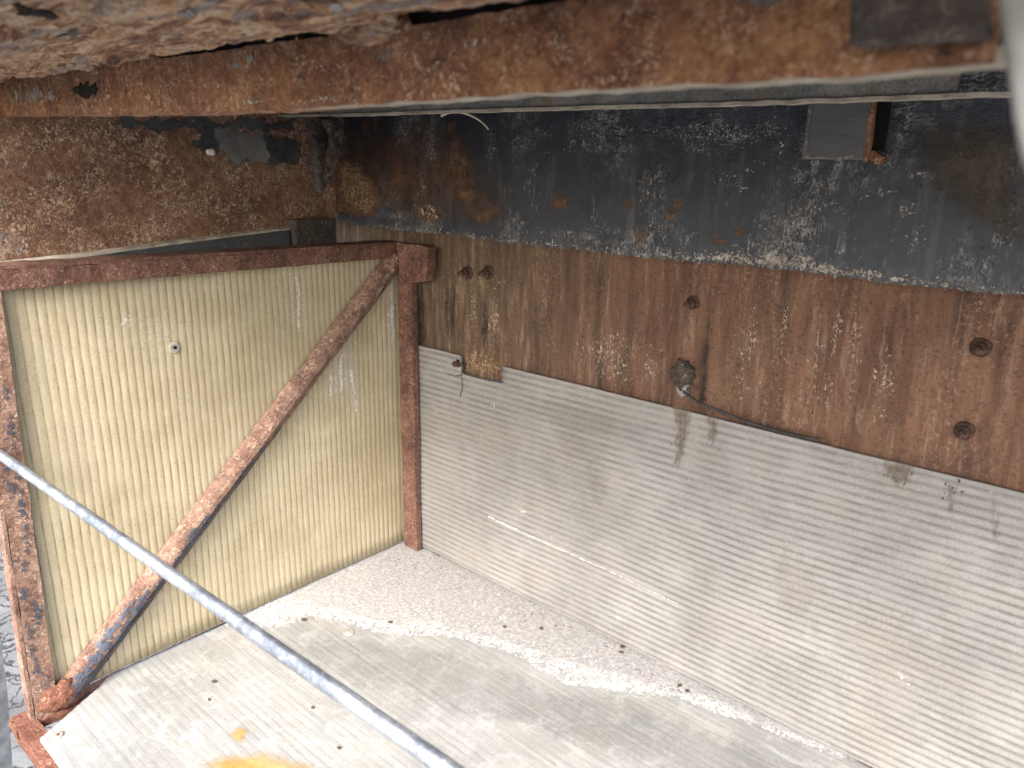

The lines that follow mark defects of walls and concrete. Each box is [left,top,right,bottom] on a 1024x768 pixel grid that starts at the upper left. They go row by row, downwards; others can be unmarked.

corrosion [335,155,385,218]
leakage [564,115,797,192]
leakage [629,165,846,270]
corrosion [452,277,505,352]